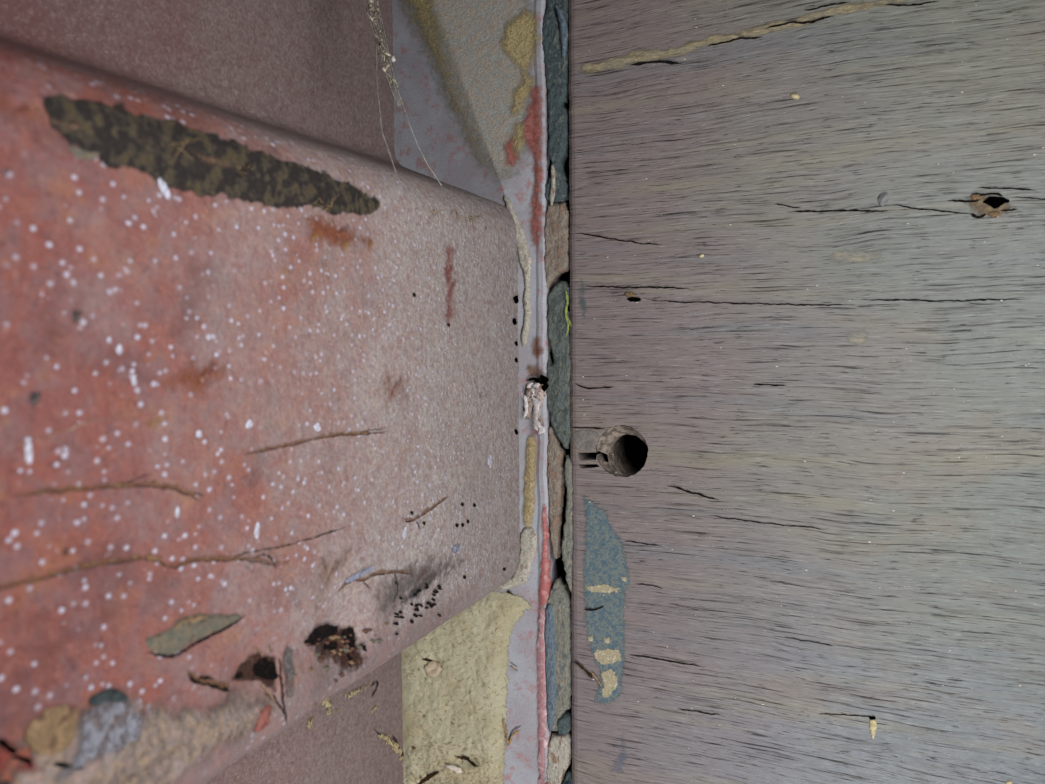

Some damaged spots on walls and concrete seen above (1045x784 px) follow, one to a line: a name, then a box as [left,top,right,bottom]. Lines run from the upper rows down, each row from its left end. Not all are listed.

crack [246,428,387,455]
crack [13,473,204,501]
crack [402,495,449,530]
crack [0,526,348,590]
peeling [145,613,246,658]
spalling [304,583,443,682]
spalling [232,645,279,703]
spalling [0,704,84,784]